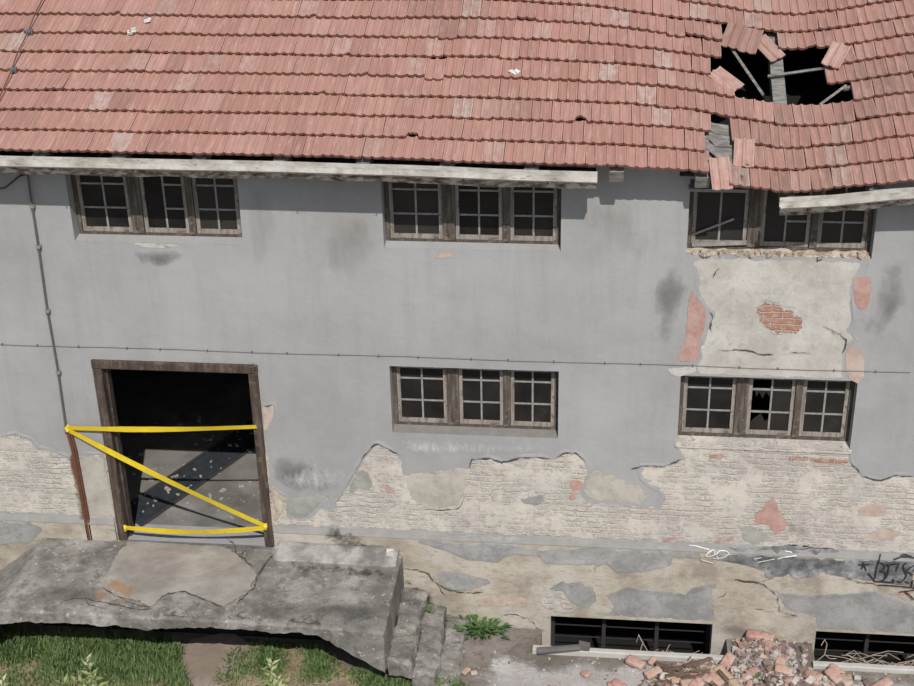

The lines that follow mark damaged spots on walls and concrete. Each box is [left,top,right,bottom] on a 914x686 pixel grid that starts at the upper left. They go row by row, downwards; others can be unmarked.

crack [709,312,810,355]
flaking render [668,258,872,384]
flaking render [0,428,118,545]
crack [64,588,151,610]
crack [167,538,273,628]
flaking render [265,440,914,634]